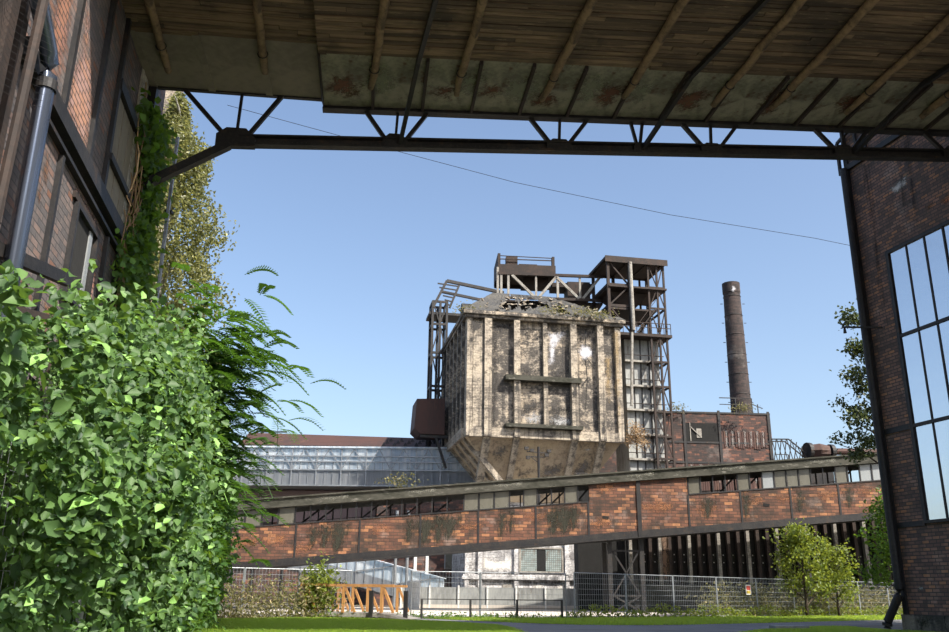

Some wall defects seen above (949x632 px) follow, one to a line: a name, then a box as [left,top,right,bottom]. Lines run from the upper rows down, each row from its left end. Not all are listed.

water stain [523,400,569,425]